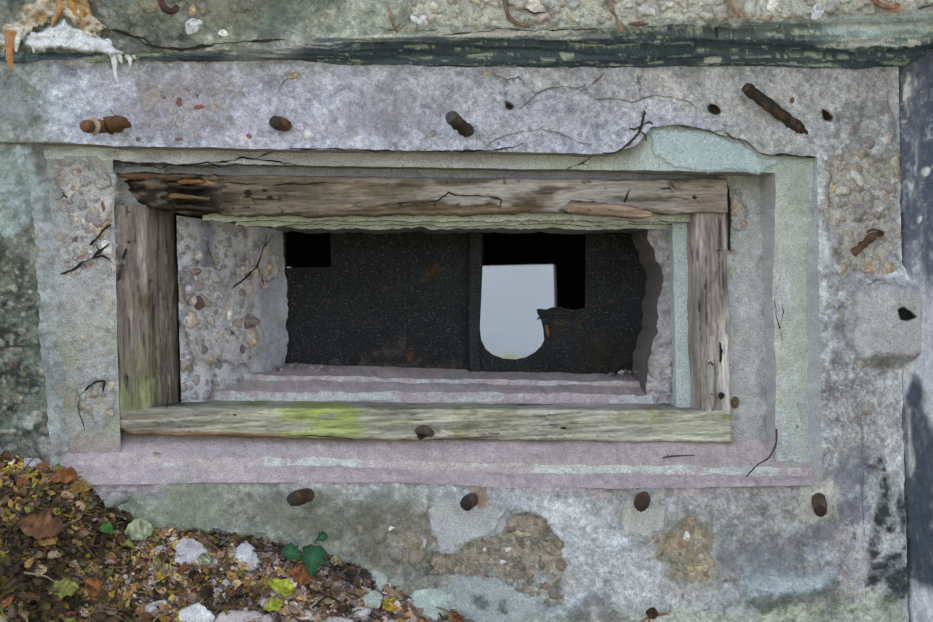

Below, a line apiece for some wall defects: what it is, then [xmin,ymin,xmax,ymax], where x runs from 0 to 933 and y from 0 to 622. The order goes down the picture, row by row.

damp [0,0,136,122]
spalling [407,0,933,30]
rust [103,115,132,135]
crack [123,73,815,169]
damp [839,376,933,602]
spalling [350,506,566,607]